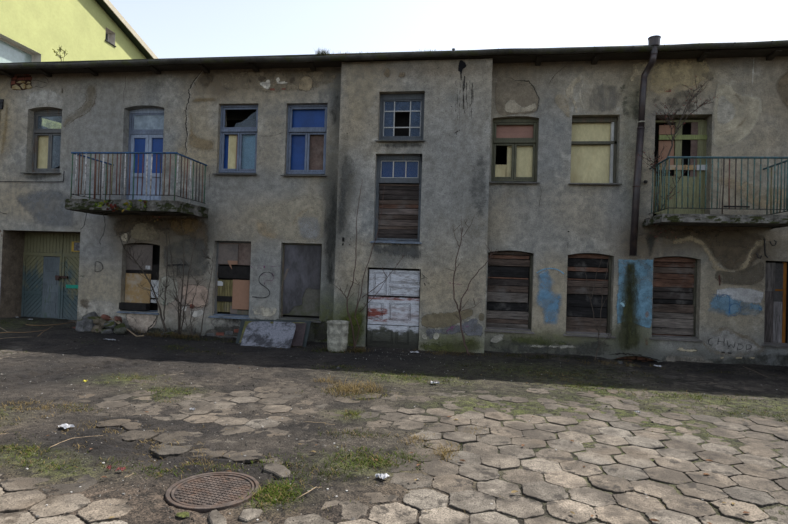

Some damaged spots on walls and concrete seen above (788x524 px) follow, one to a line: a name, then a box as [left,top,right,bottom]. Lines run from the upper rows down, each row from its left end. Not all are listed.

crack [184,71,203,154]
peeling [220,69,336,92]